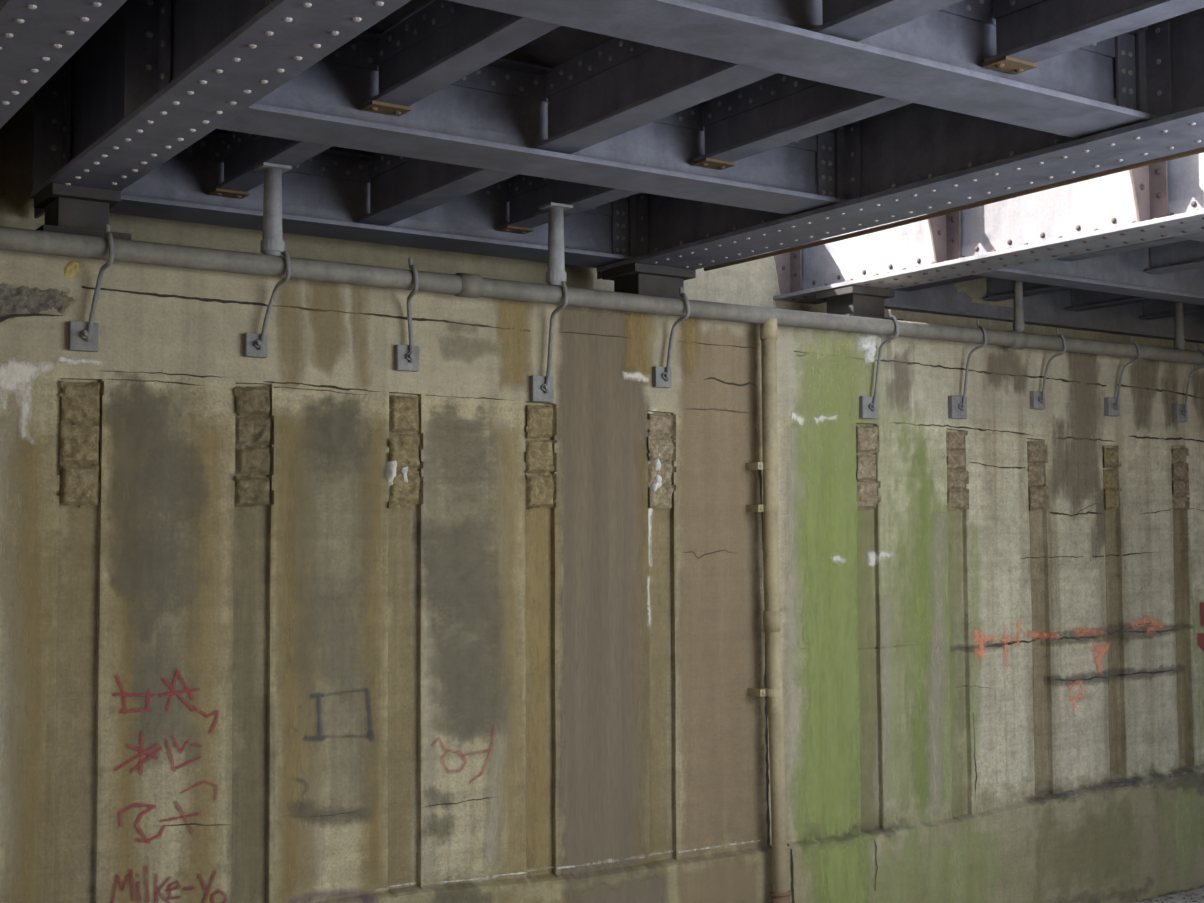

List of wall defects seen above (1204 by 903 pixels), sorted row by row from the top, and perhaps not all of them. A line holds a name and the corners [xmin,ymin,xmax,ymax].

spalling [0,283,74,323]
crack [82,286,629,338]
damp [989,348,1027,391]
damp [792,413,836,425]
crack [891,422,1204,442]
crack [970,461,1025,469]
crack [1049,503,1105,516]
crack [1020,551,1152,559]
damp [190,419,371,903]
damp [833,509,890,826]